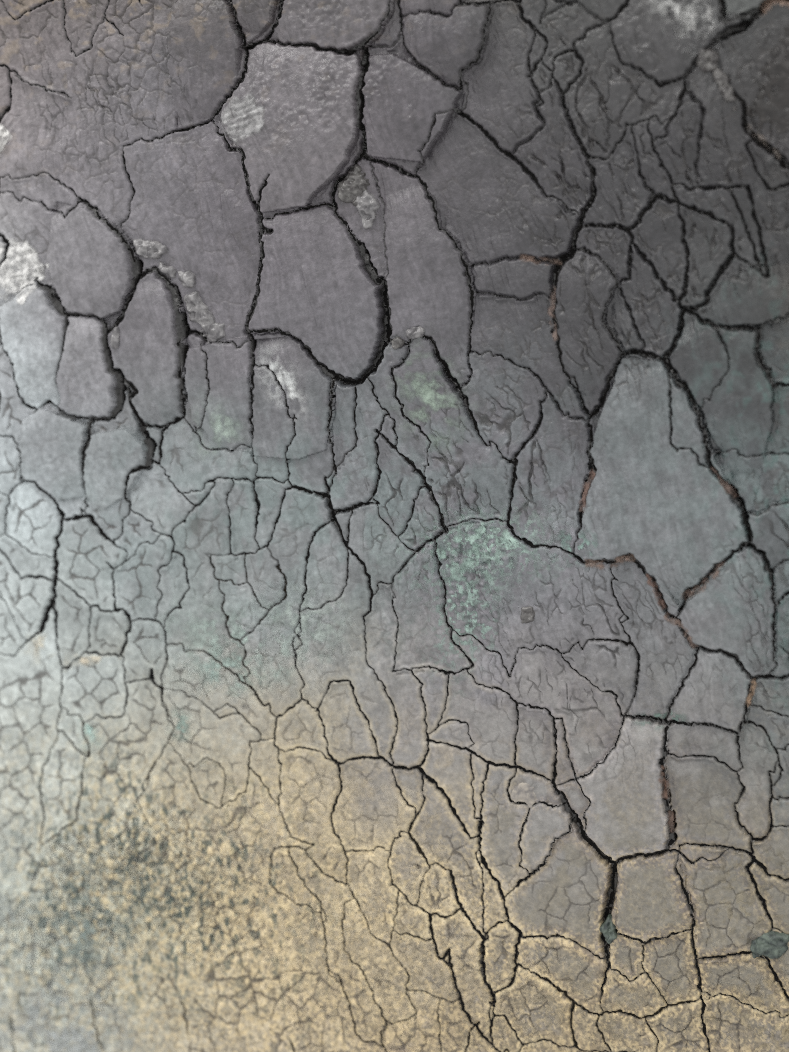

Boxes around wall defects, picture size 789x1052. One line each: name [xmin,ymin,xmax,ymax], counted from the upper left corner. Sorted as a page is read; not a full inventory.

crack [2,0,124,57]
crack [0,64,69,123]
crack [37,281,62,301]
crack [0,172,144,266]
crack [122,0,521,356]
crack [447,0,789,522]
crack [0,330,38,412]
crack [0,435,226,849]
crack [43,250,789,1052]